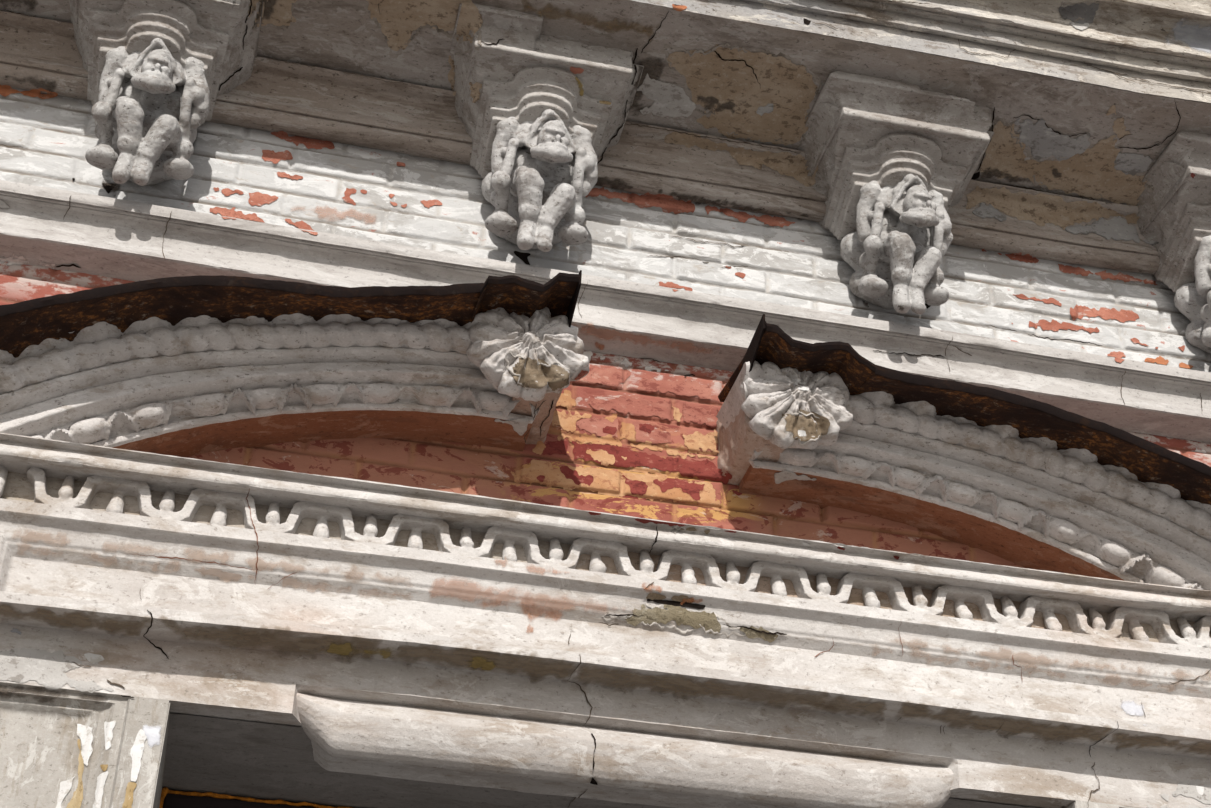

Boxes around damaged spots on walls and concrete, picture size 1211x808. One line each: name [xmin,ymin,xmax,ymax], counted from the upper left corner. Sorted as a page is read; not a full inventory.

crack [597,4,796,164]
crack [971,62,1211,200]
peeling [210,187,278,223]
peeling [1012,294,1139,334]
peeling [495,351,742,511]
spalling [777,408,830,445]
crack [138,489,297,589]
spalling [635,518,710,535]
crack [140,595,168,658]
spalling [599,593,787,643]
crack [567,634,598,807]
crack [1088,721,1119,806]